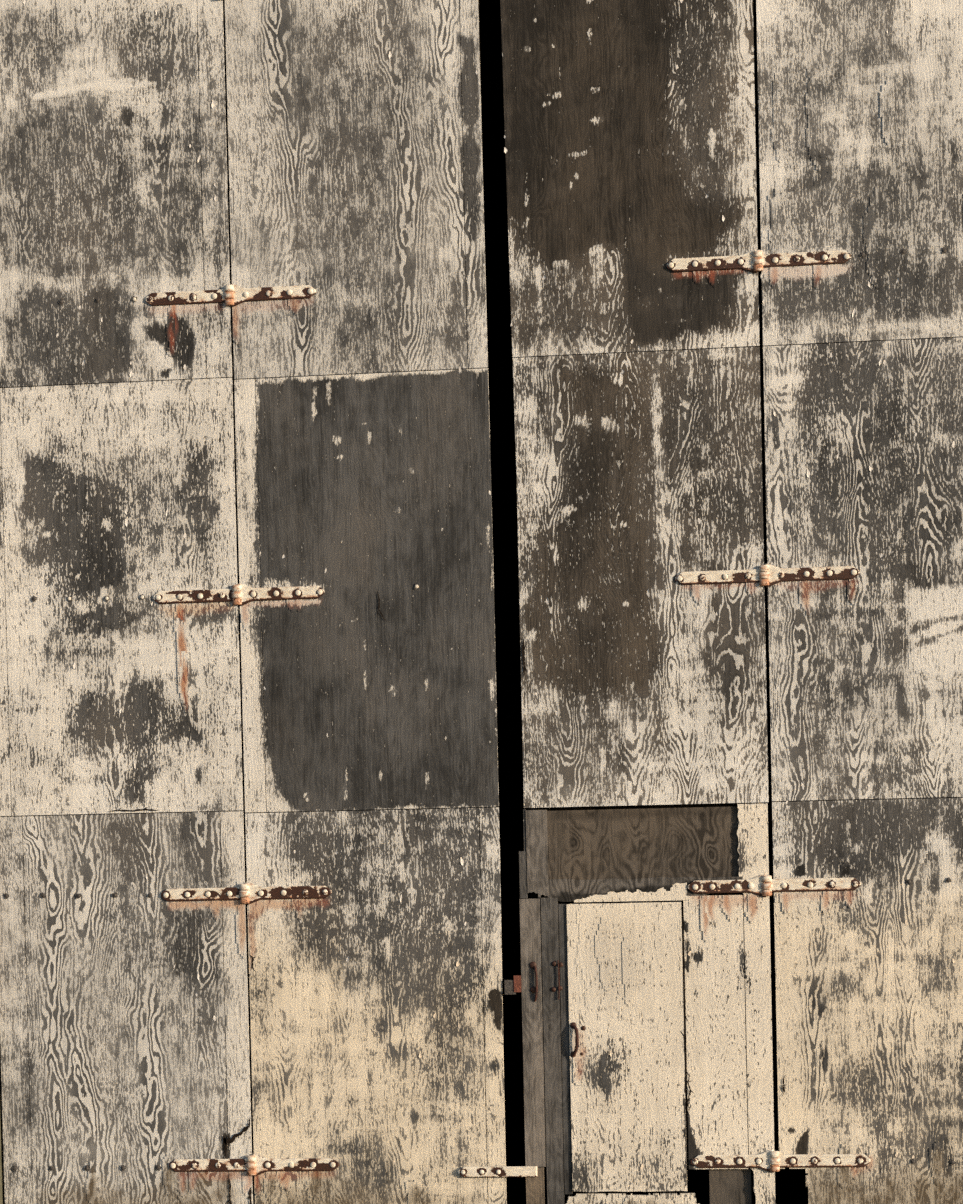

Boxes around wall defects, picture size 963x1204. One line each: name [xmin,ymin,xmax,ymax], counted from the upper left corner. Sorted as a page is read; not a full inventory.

corrosion [667,253,855,289]
corrosion [144,290,319,357]
peeling [500,0,963,808]
peeling [0,0,503,1128]
corrosion [676,568,861,617]
corrosion [154,587,326,713]
peeling [694,588,963,1070]
corrosion [163,881,333,976]
corrosion [687,880,862,942]
peeling [1,1062,59,1145]
peeling [817,1044,963,1161]
crack [223,1119,252,1204]